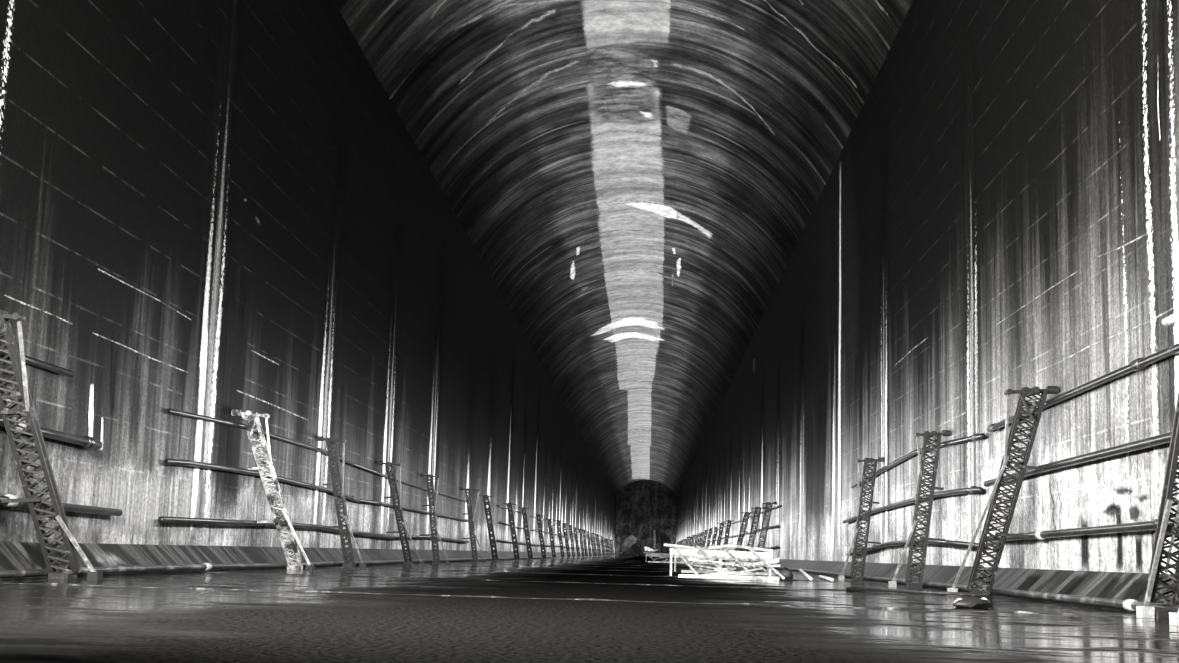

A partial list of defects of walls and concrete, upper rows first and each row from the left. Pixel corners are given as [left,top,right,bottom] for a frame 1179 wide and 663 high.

damp [0,0,14,128]
damp [1103,249,1139,555]
damp [1142,0,1179,536]